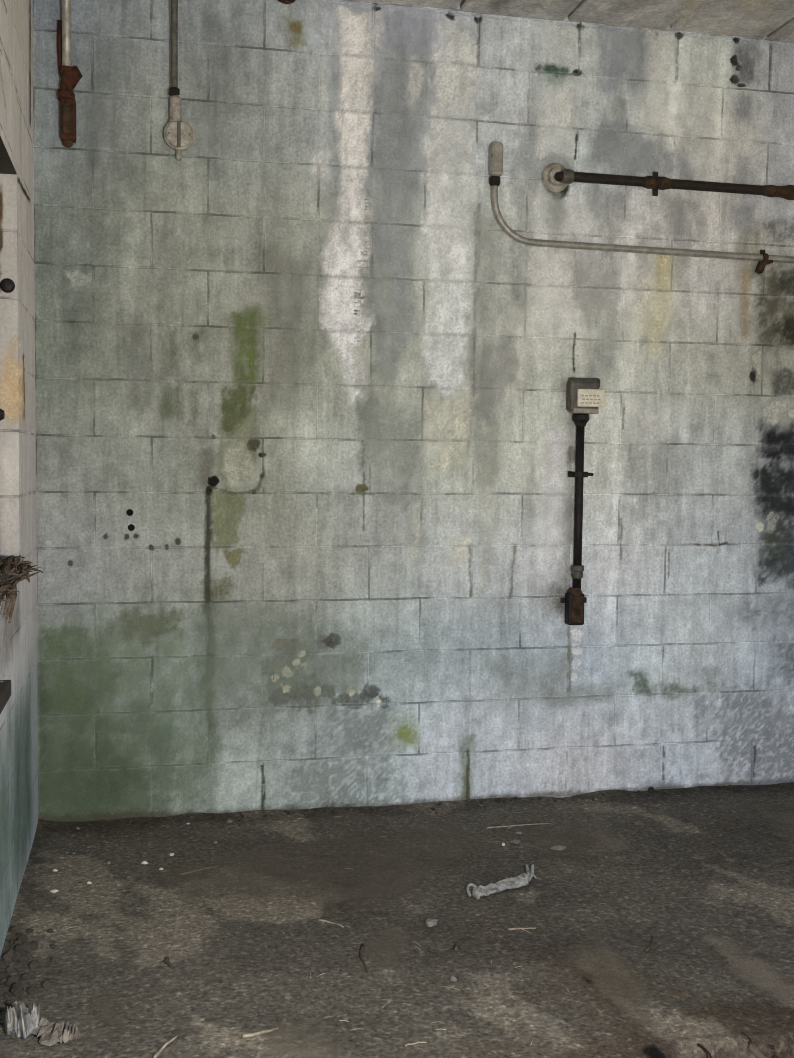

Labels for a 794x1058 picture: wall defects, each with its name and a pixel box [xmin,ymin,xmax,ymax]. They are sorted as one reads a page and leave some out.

corrosion [762,185,794,200]
damp [319,0,518,471]
damp [756,268,794,345]
damp [222,386,255,432]
damp [774,369,794,394]
damp [754,424,794,584]